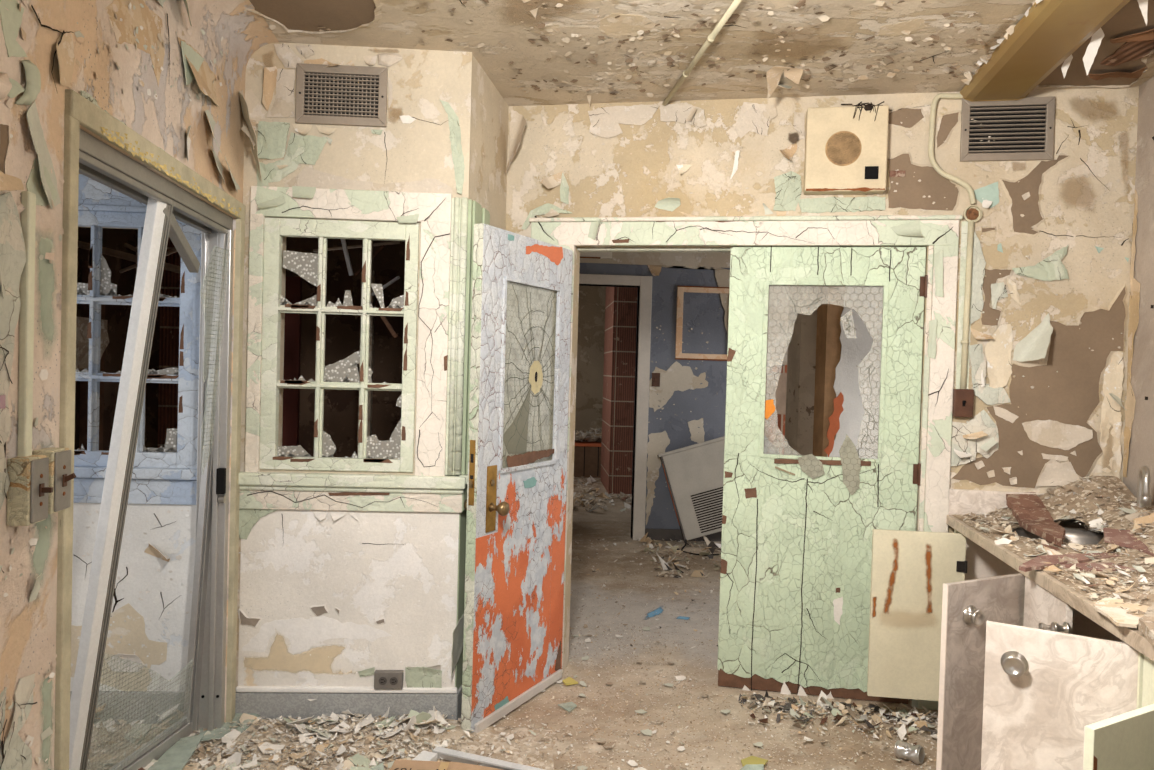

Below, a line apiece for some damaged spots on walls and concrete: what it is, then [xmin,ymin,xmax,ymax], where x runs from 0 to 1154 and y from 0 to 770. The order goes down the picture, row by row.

peeling [56,22,127,126]
peeling [97,0,240,192]
peeling [234,0,465,209]
crack [112,567,128,612]
peeling [100,510,193,691]
crack [503,284,556,457]
peeling [646,328,708,525]
crack [596,223,852,340]
crack [726,306,879,695]
flaking render [505,0,1154,490]
corrosion [872,540,898,617]
peeling [0,654,57,770]